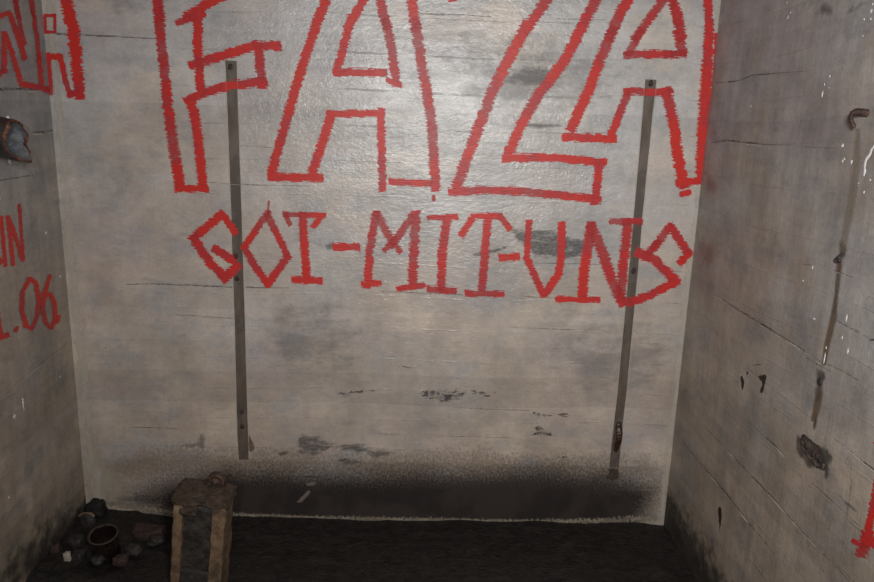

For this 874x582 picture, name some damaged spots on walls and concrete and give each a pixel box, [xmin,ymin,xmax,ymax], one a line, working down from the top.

corrosion [823,259,841,365]
corrosion [812,385,821,421]
spalling [797,434,832,477]
water stain [106,480,180,517]
water stain [223,466,720,582]